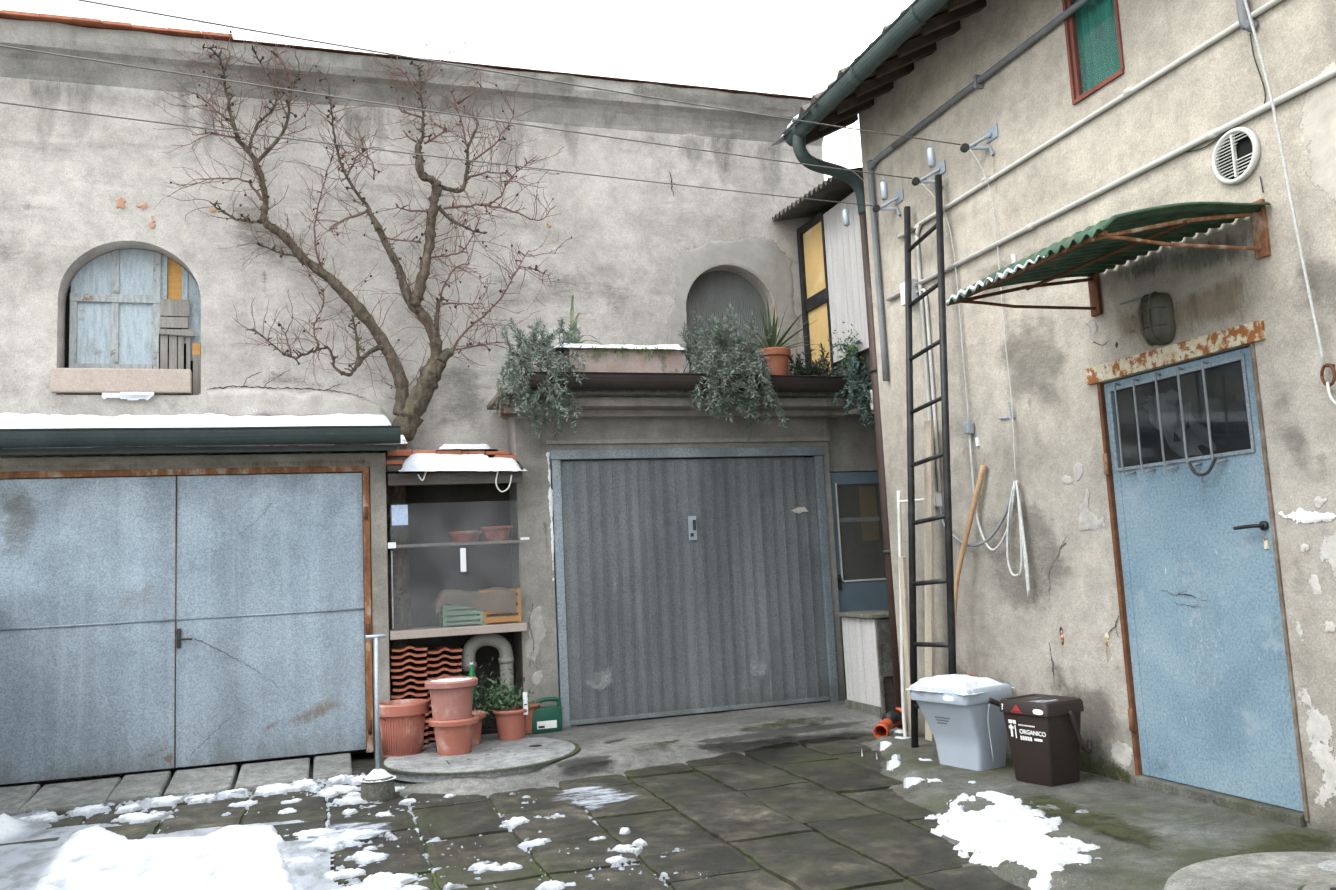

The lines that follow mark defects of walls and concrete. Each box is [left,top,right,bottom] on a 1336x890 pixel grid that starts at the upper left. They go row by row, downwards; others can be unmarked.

water stain [999,514,1059,602]
peeling [1300,530,1336,601]
peeling [1323,620,1336,633]
water stain [1059,680,1112,749]
peeling [1298,687,1336,808]